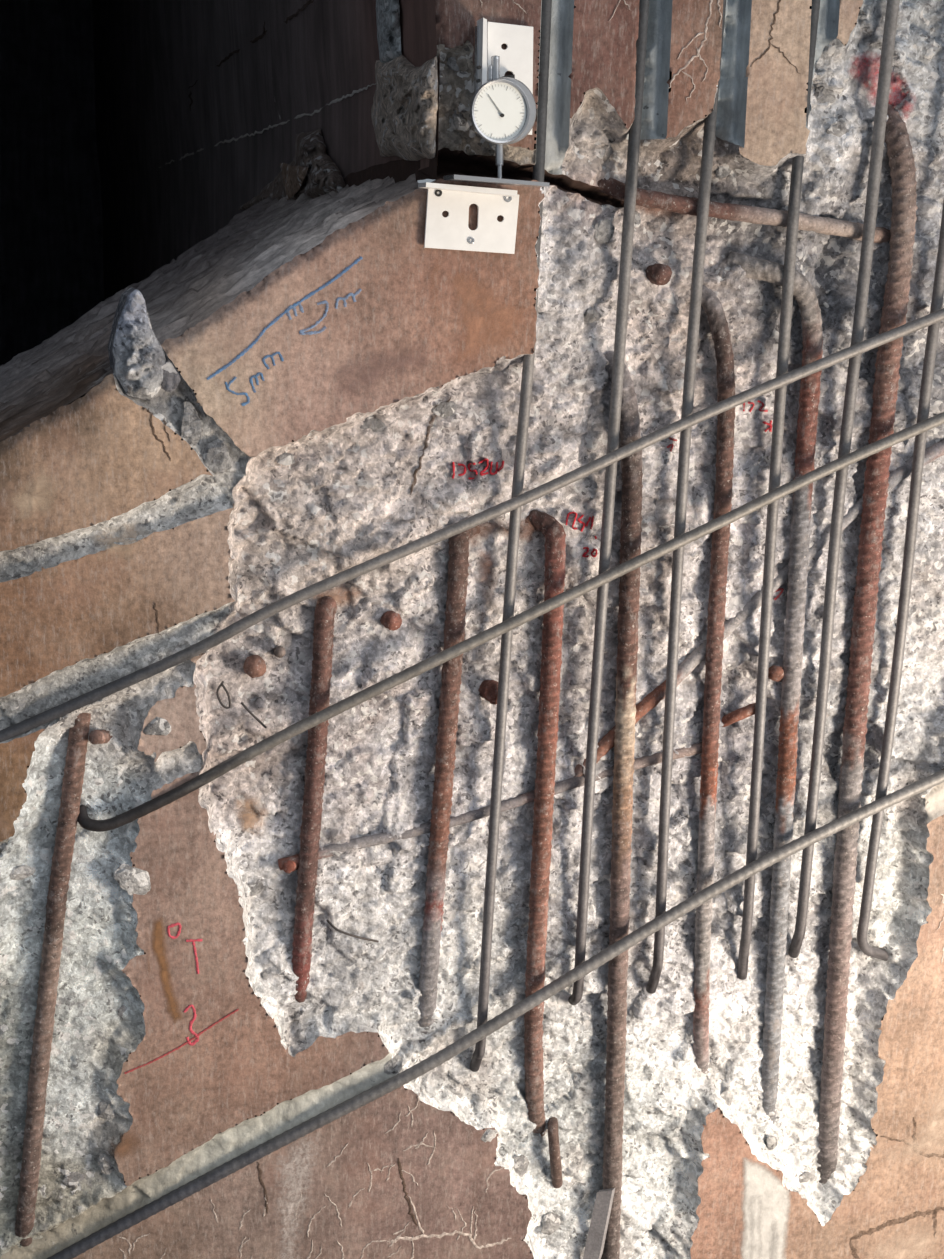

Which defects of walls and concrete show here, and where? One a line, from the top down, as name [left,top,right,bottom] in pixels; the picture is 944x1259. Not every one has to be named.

crack [669,0,722,100]
crack [750,0,800,74]
spalling [371,40,536,165]
crack [343,148,624,208]
corrosion [482,554,495,604]
corrosion [469,521,537,542]
spalling [487,0,944,1021]
spalling [0,88,632,1257]
spalling [403,787,934,1259]
crack [210,1087,512,1259]
crack [880,1119,944,1158]
crack [849,1207,944,1258]